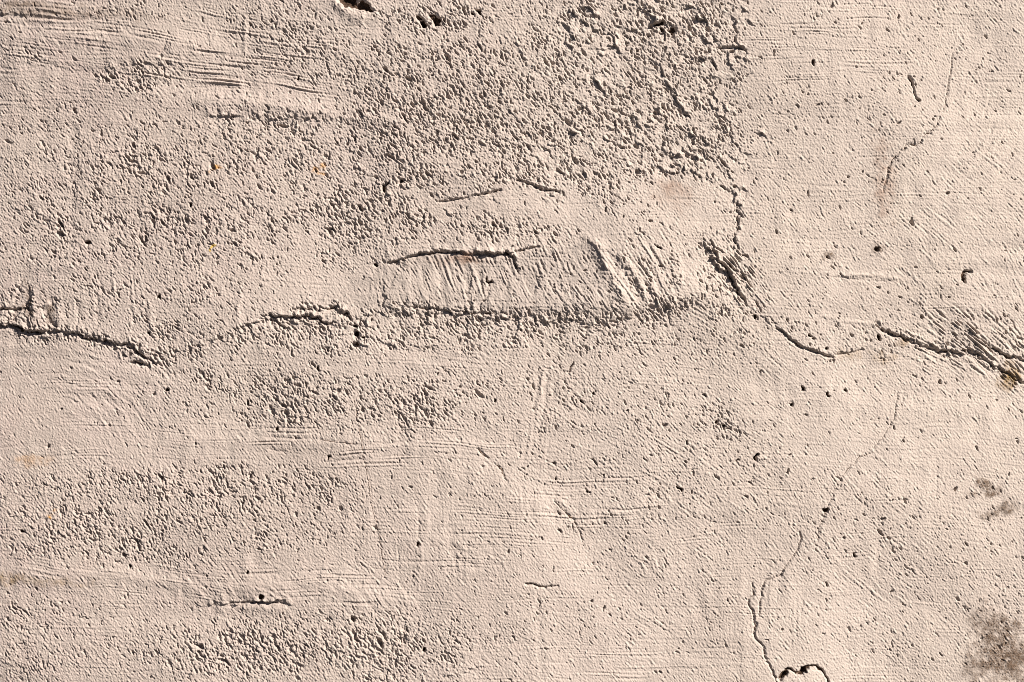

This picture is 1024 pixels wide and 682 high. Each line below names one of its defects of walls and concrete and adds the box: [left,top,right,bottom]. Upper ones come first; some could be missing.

crack [392,247,535,271]
crack [715,183,747,299]
crack [0,308,156,365]
crack [270,307,350,329]
crack [776,328,859,357]
crack [881,329,1024,383]